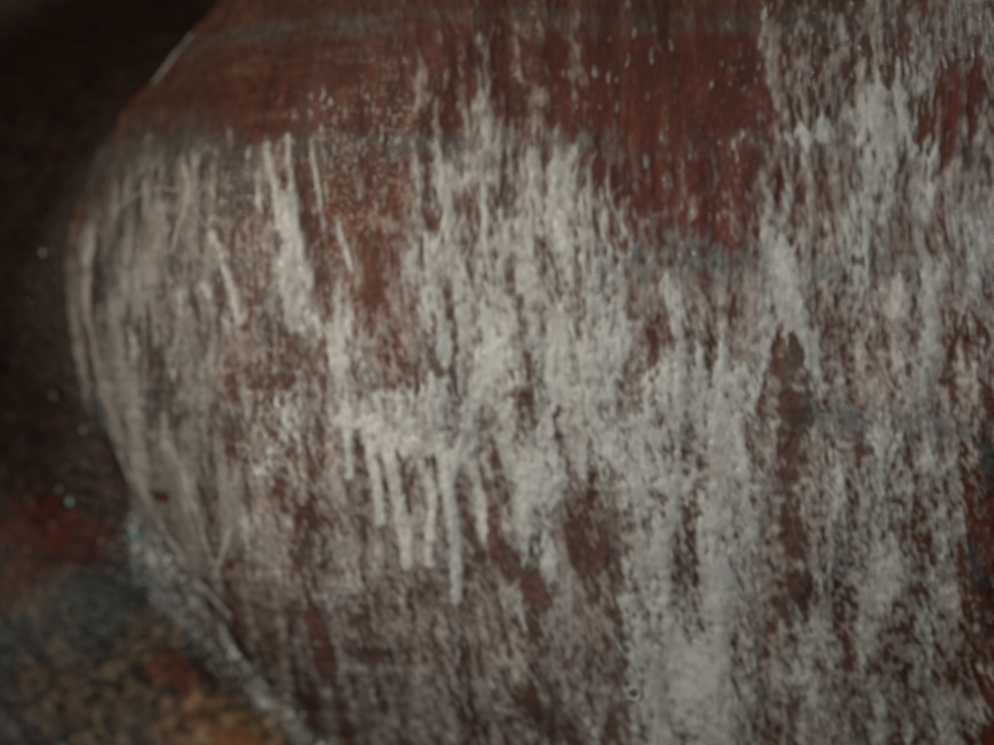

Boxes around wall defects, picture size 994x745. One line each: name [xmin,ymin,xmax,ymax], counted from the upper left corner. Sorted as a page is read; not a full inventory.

damp [66,33,833,745]
damp [755,3,791,97]
damp [766,0,994,745]